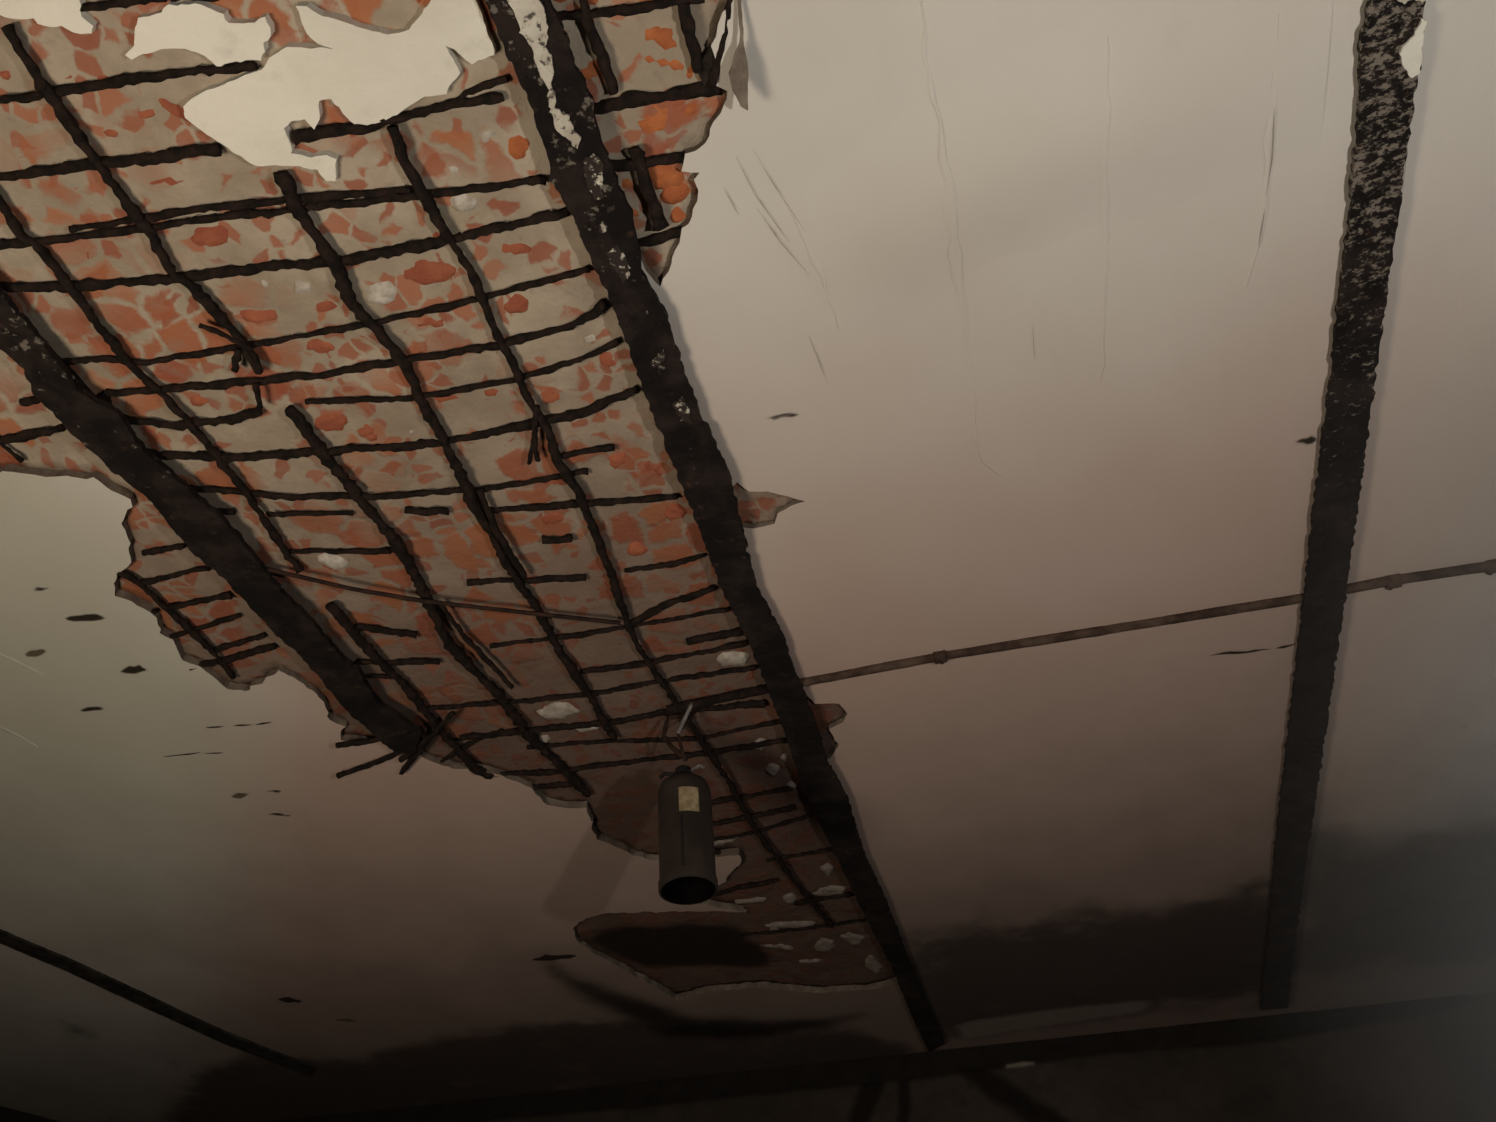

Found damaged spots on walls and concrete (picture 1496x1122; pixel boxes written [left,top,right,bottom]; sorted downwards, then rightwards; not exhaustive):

crack [724,151,805,270]
spalling [0,0,896,994]
damp [959,1002,1147,1039]